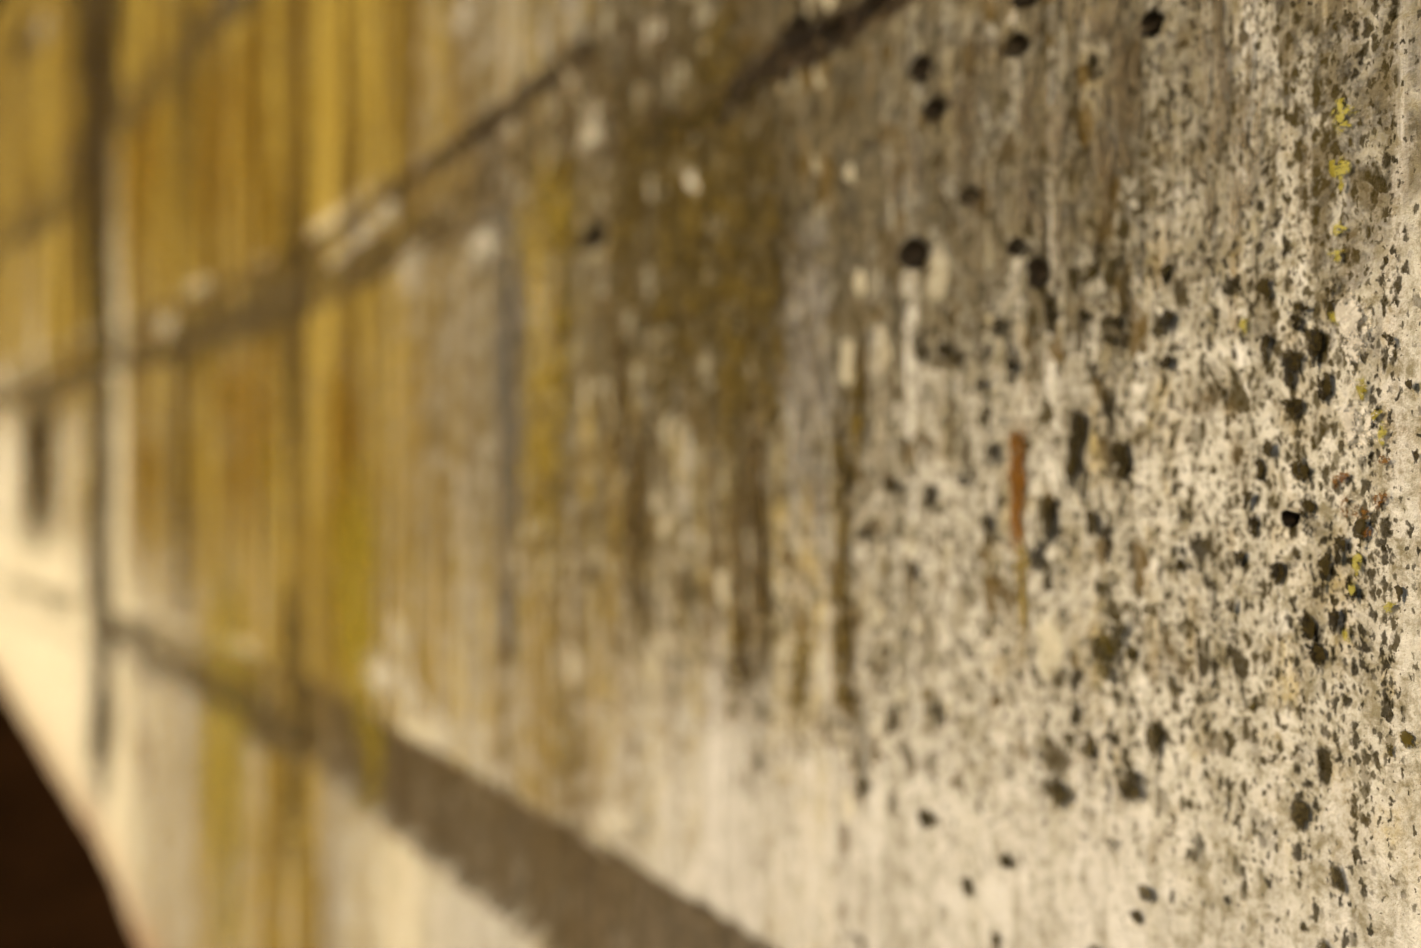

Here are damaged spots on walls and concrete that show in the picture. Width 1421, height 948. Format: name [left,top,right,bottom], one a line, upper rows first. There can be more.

corrosion [1008,422,1029,655]